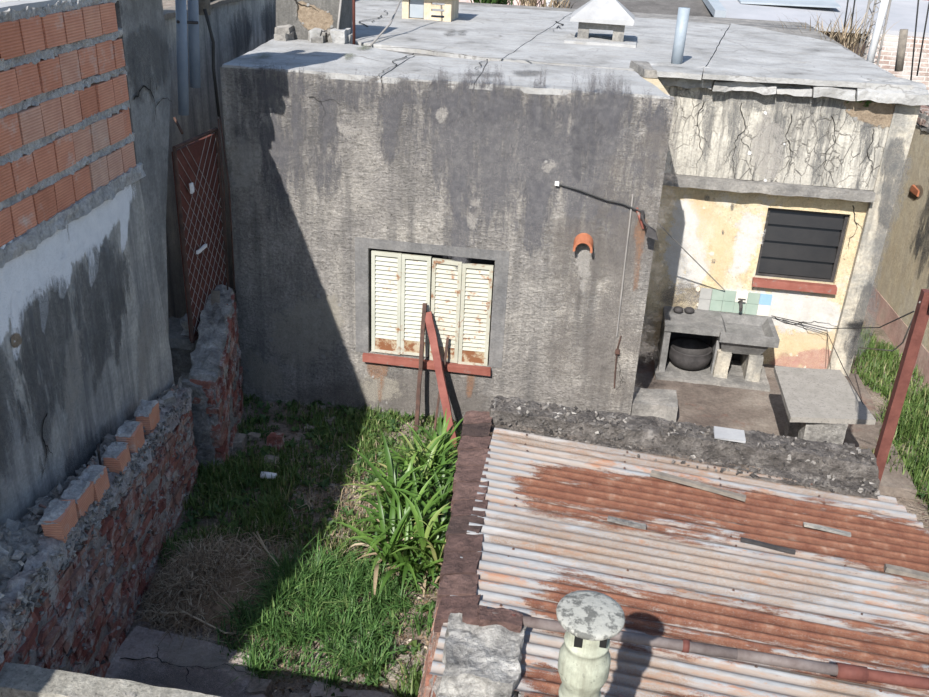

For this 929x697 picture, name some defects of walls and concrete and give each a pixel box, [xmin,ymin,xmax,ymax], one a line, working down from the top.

water stain [0,191,131,484]
water stain [227,0,736,412]
peeling [662,194,717,309]
crack [696,101,752,177]
peeling [728,210,767,275]
peeling [725,287,841,335]
water stain [691,89,914,365]
crack [815,115,875,246]
water stain [910,186,929,287]
spalling [0,384,196,675]
corrosion [490,425,929,697]
crack [120,646,250,685]